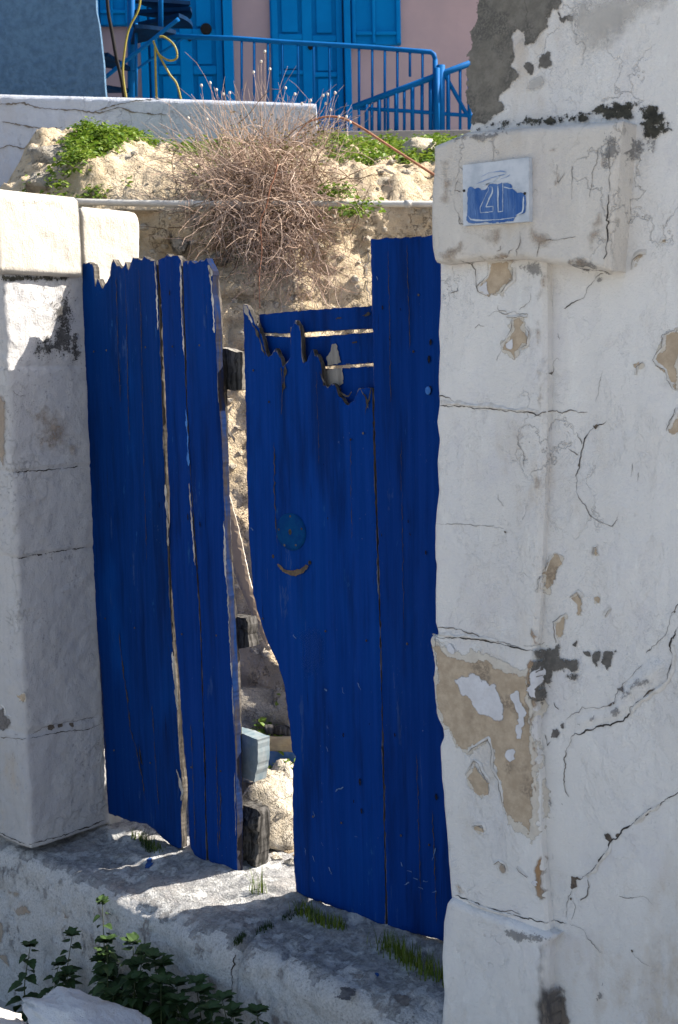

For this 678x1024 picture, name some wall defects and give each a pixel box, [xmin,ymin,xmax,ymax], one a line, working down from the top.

flaking render [465,0,573,125]
crack [0,99,164,149]
crack [556,140,611,309]
flaking render [476,256,516,297]
flaking render [500,315,530,360]
flaking render [633,327,678,391]
crack [439,374,618,527]
flaking render [666,407,678,435]
flaking render [535,553,564,595]
crack [1,717,95,740]
flaking render [431,589,616,844]
crack [545,604,678,797]